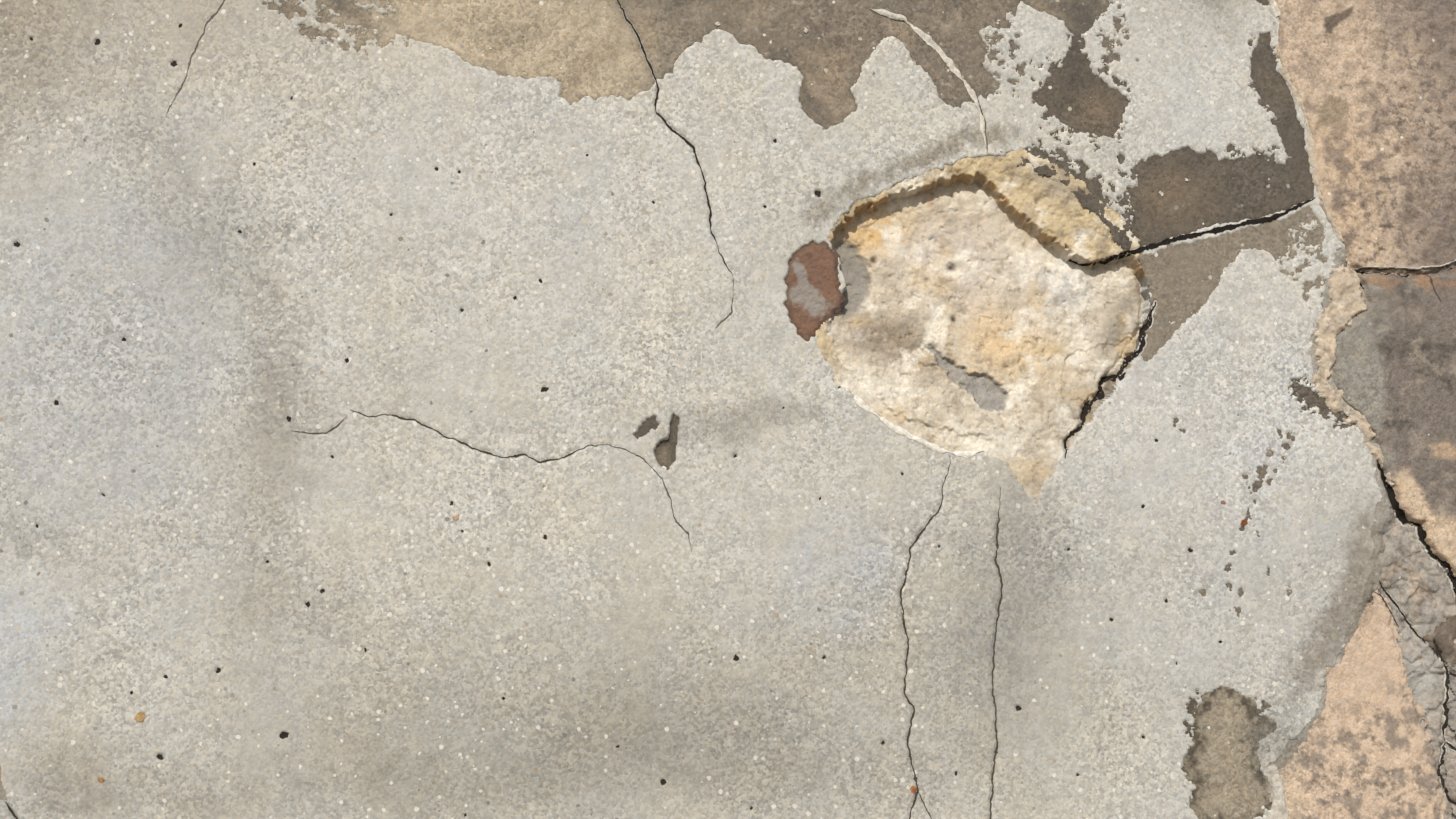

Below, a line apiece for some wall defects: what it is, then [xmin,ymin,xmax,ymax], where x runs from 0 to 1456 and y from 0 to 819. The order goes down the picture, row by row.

crack [291,410,692,552]
crack [617,0,734,328]
spalling [262,0,1456,778]
crack [900,461,951,819]
crack [989,488,1003,819]
crack [1064,301,1156,459]
crack [1069,197,1315,266]
peeling [1181,686,1277,819]